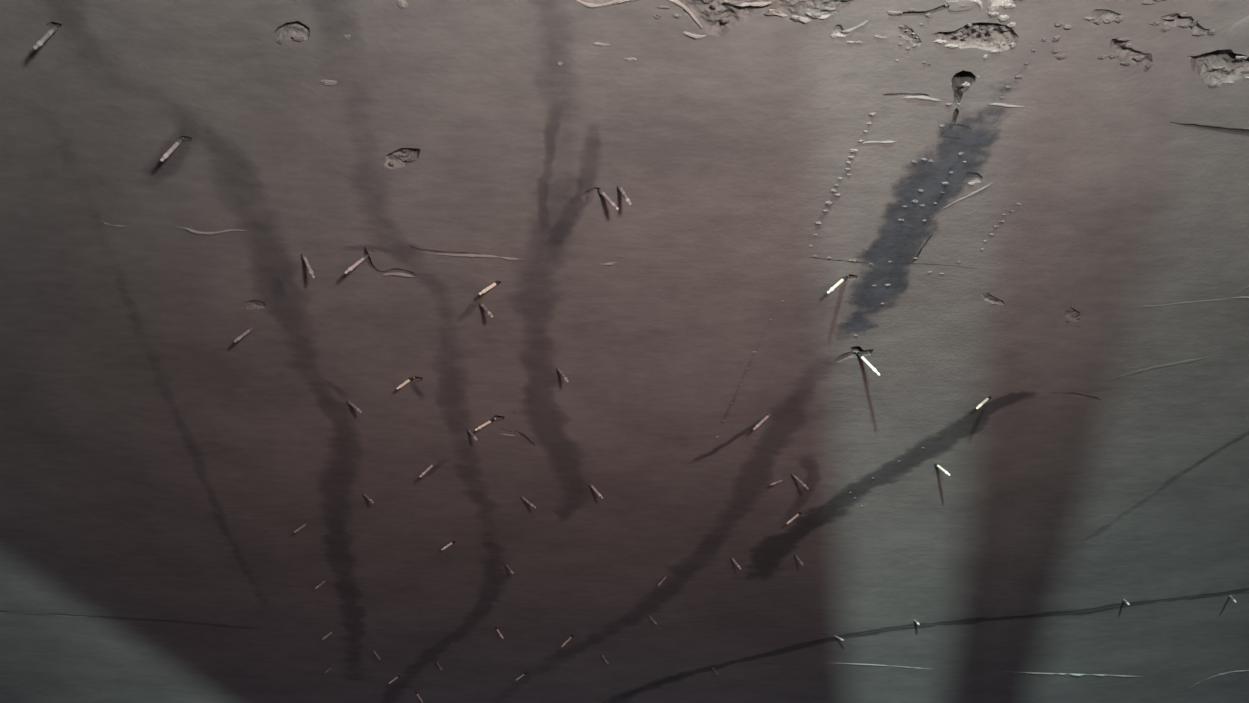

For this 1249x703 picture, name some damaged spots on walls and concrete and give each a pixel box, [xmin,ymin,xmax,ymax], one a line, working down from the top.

spalling [653,0,1023,61]
spalling [1142,0,1249,88]
crack [1170,122,1249,134]
crack [806,589,1249,645]